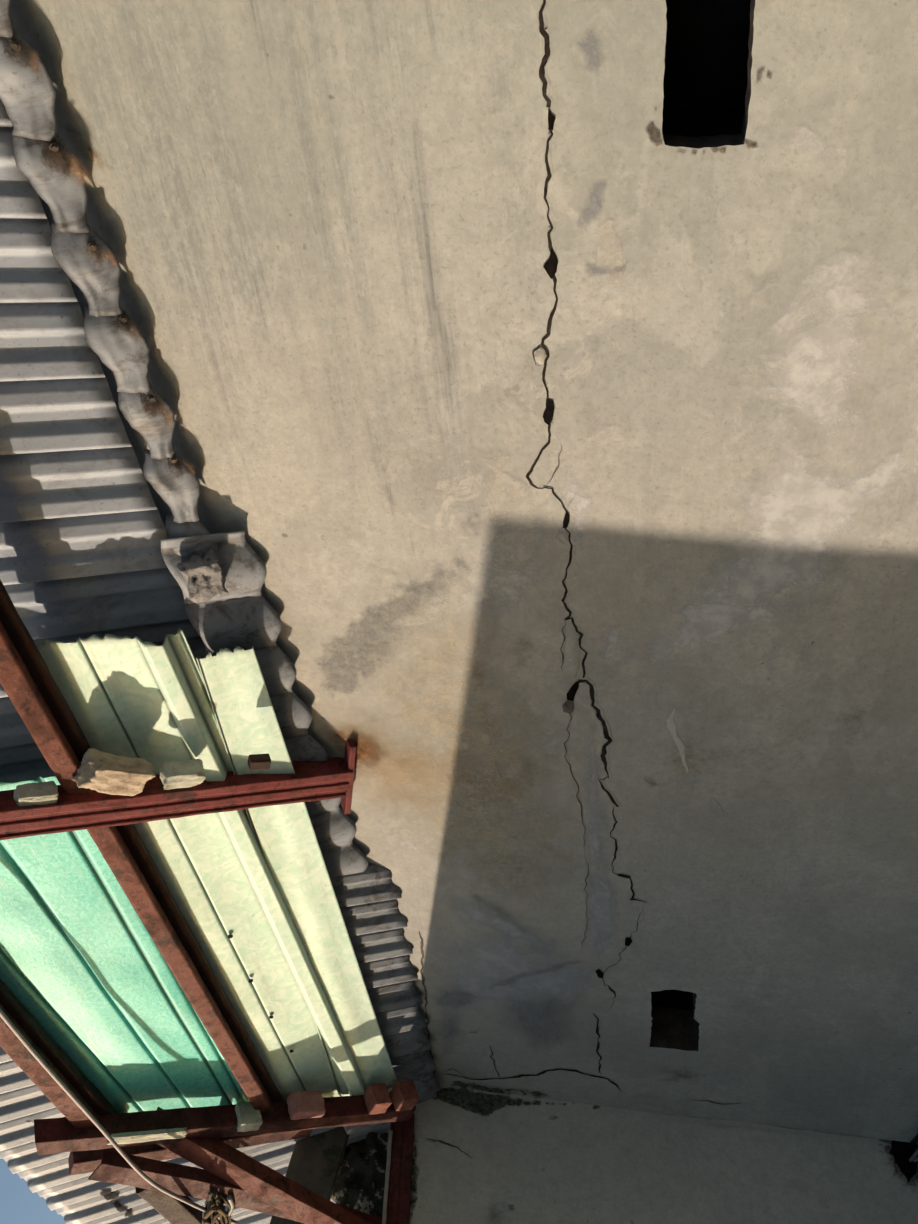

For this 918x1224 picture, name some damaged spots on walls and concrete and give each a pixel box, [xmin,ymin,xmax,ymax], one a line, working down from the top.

spalling [647,0,771,153]
crack [419,0,647,1091]
mould [433,1081,567,1116]